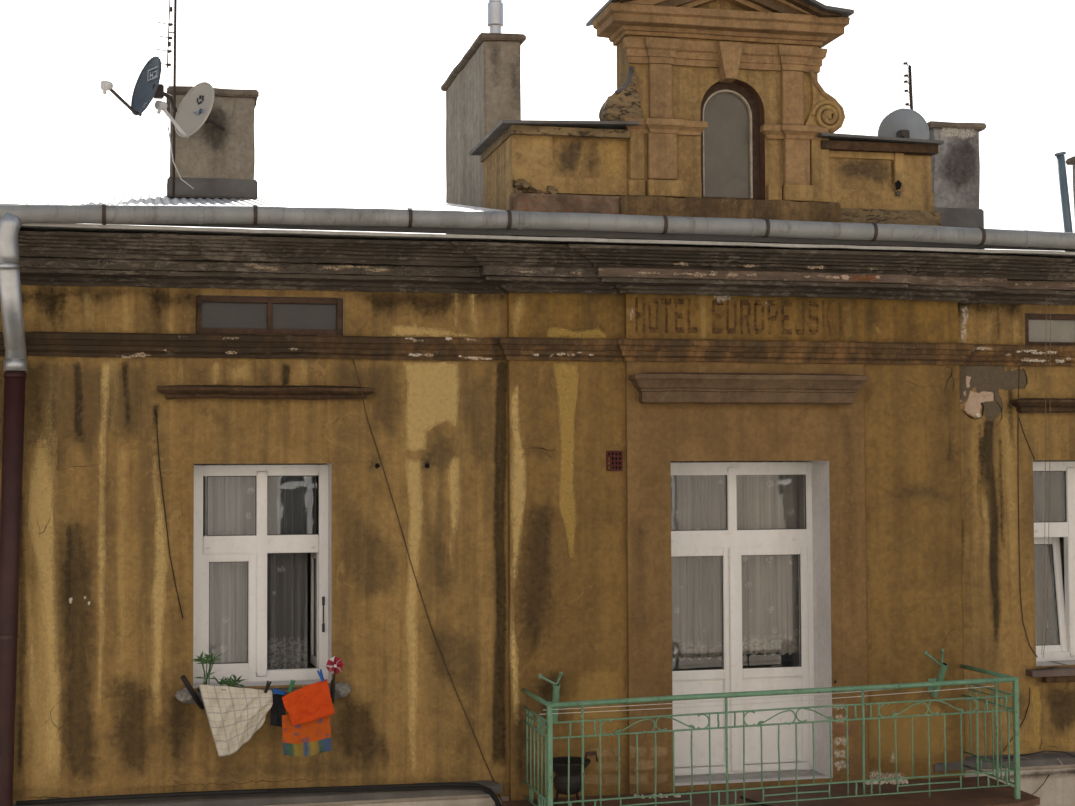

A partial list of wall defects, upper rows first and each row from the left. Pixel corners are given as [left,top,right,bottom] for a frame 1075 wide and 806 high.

leakage [21,439,104,773]
leakage [74,366,82,436]
leakage [118,503,165,764]
leakage [407,461,421,731]
leakage [406,362,458,449]
leakage [450,459,458,527]
leakage [493,362,549,767]
leakage [555,364,577,547]
flaking render [960,376,994,419]
leakage [980,389,1012,639]